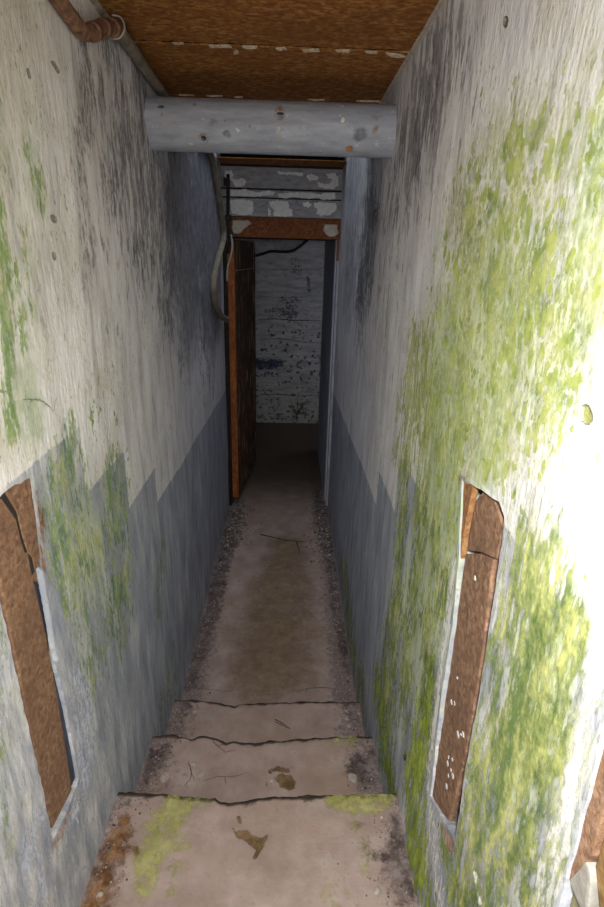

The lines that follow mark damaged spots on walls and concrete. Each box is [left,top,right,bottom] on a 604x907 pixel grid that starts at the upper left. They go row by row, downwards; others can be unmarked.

peeling [209,44,257,55]
peeling [365,50,406,58]
water stain [24,143,45,212]
peeling [224,170,339,217]
water stain [0,201,33,446]
water stain [256,358,283,370]
water stain [519,223,583,447]
water stain [42,412,135,827]
water stain [341,318,464,907]
crack [184,762,245,786]
water stain [532,589,601,907]